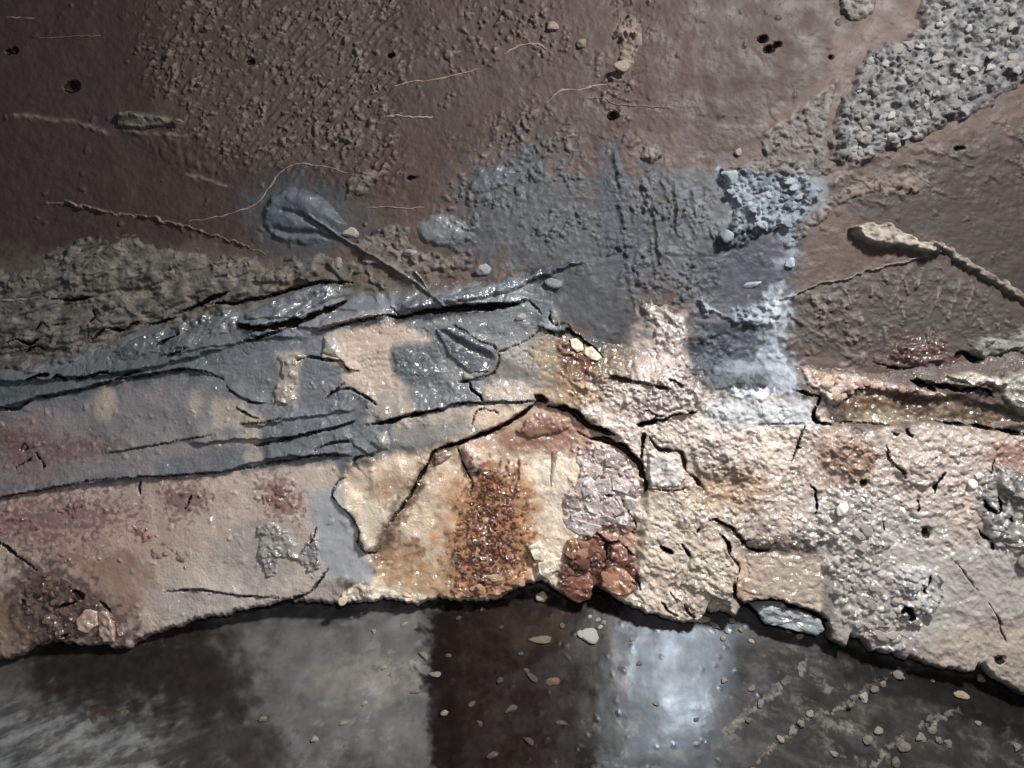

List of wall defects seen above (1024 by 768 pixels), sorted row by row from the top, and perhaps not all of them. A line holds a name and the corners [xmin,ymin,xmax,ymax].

leakage [454,146,810,424]
crack [0,266,828,633]
crack [761,390,914,478]
rust [842,386,1021,426]
crack [917,473,947,512]
crack [873,351,993,398]
crack [936,420,1024,435]
crack [977,498,1014,550]
rust [372,416,642,768]
crack [901,577,932,621]
leakage [33,624,269,768]
leakage [829,642,1024,739]